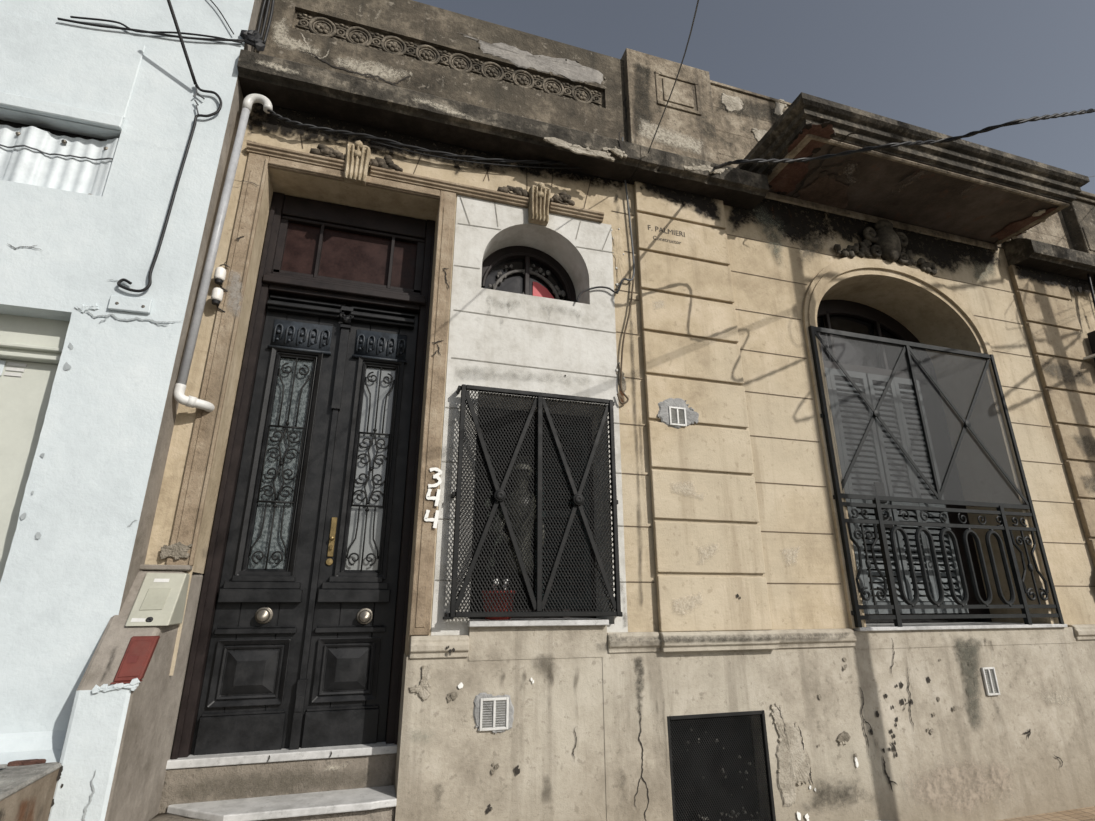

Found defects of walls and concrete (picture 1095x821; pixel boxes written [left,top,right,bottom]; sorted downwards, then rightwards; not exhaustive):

spalling [543,137,627,162]
crack [78,309,177,326]
leakage [956,640,986,725]
crack [635,708,649,820]
crack [82,770,96,821]